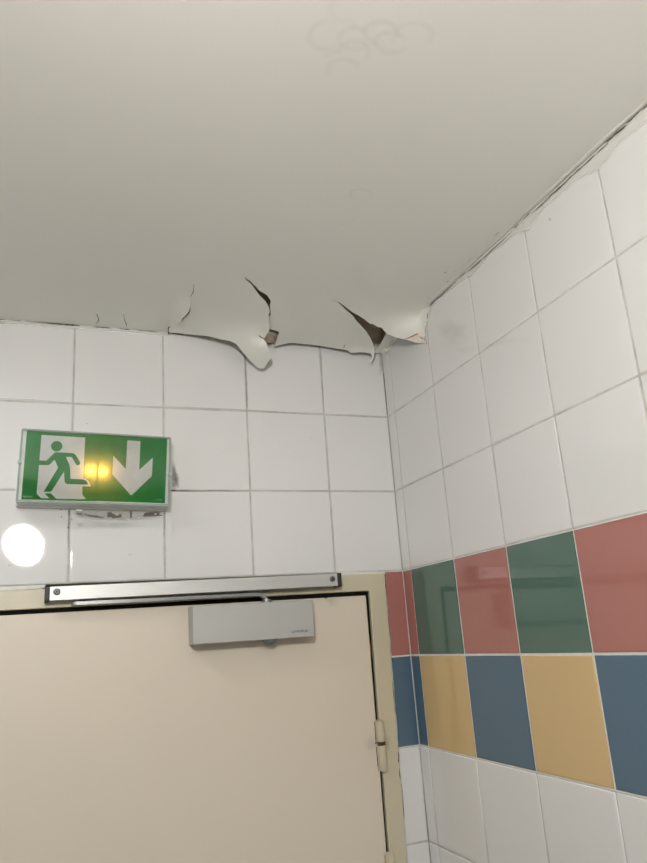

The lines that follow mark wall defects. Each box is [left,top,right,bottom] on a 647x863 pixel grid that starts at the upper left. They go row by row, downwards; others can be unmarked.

crack [425,105,647,330]
crack [0,313,180,334]
peeling [168,274,430,369]